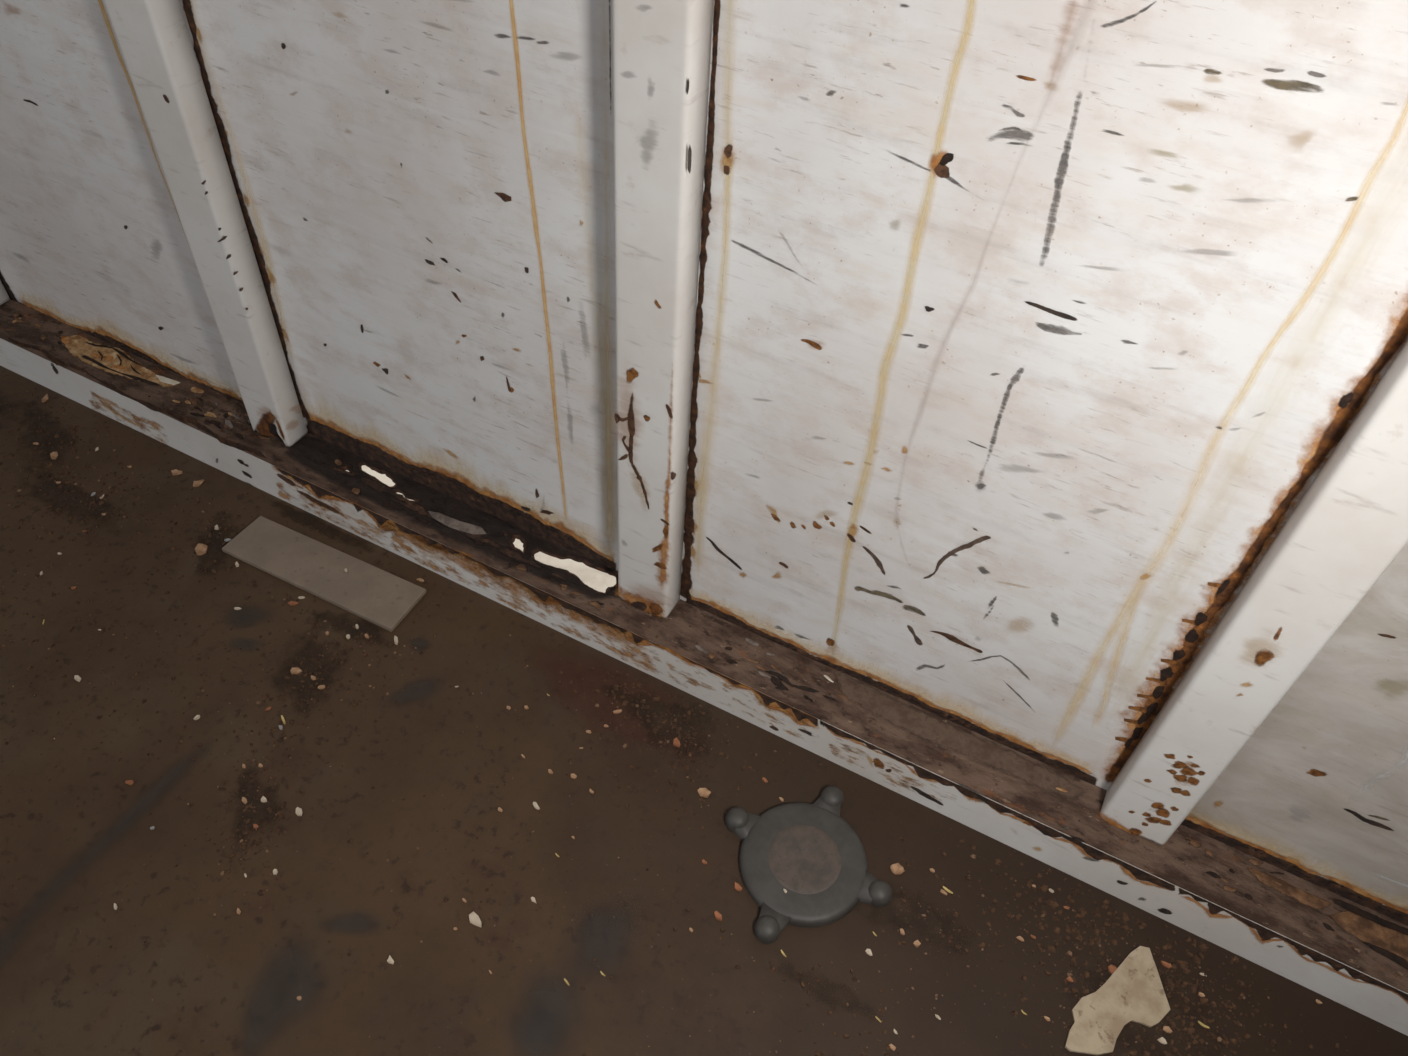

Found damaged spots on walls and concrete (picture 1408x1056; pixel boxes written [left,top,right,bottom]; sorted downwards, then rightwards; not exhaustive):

peeling [14,313,252,439]
corrosion [182,0,663,617]
peeling [383,501,487,534]
corrosion [274,466,1408,1003]
corrosion [652,0,1408,785]
peeling [1205,849,1408,970]